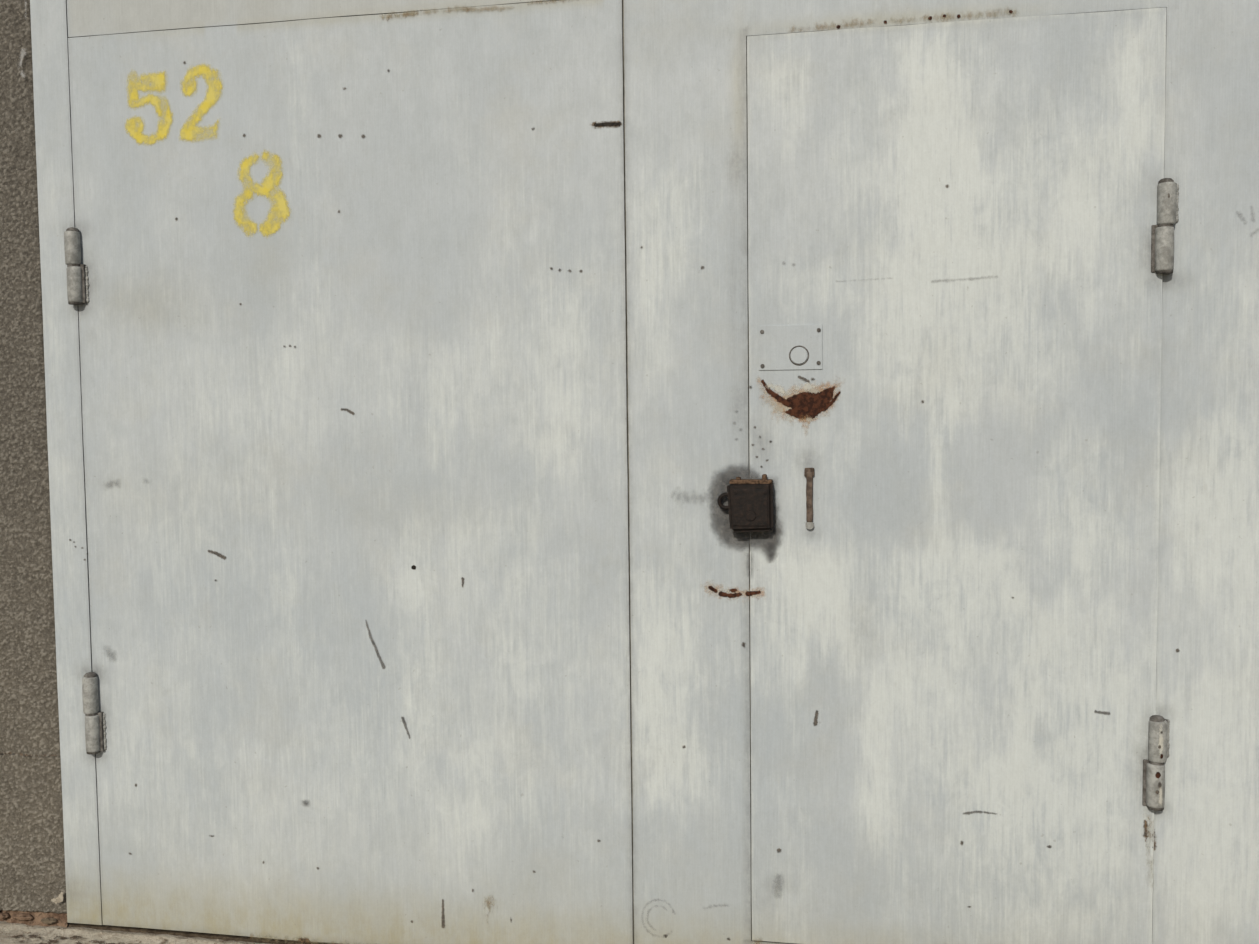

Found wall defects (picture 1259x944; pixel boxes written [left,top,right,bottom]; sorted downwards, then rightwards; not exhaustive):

rust [761,376,841,422]
rust [706,586,761,598]